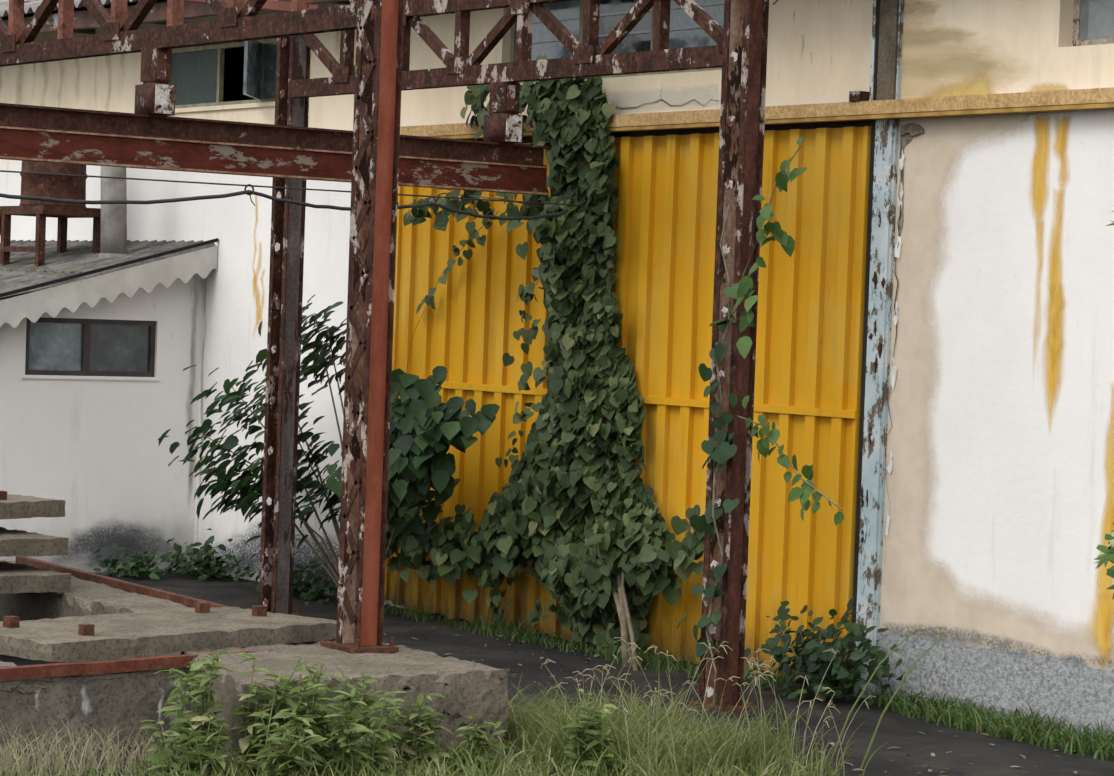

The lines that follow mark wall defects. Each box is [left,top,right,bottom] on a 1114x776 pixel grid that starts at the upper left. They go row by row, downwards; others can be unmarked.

rust [253,264,262,323]
flaking render [859,113,1114,669]
rust [1033,119,1068,415]
rust [1092,406,1114,660]